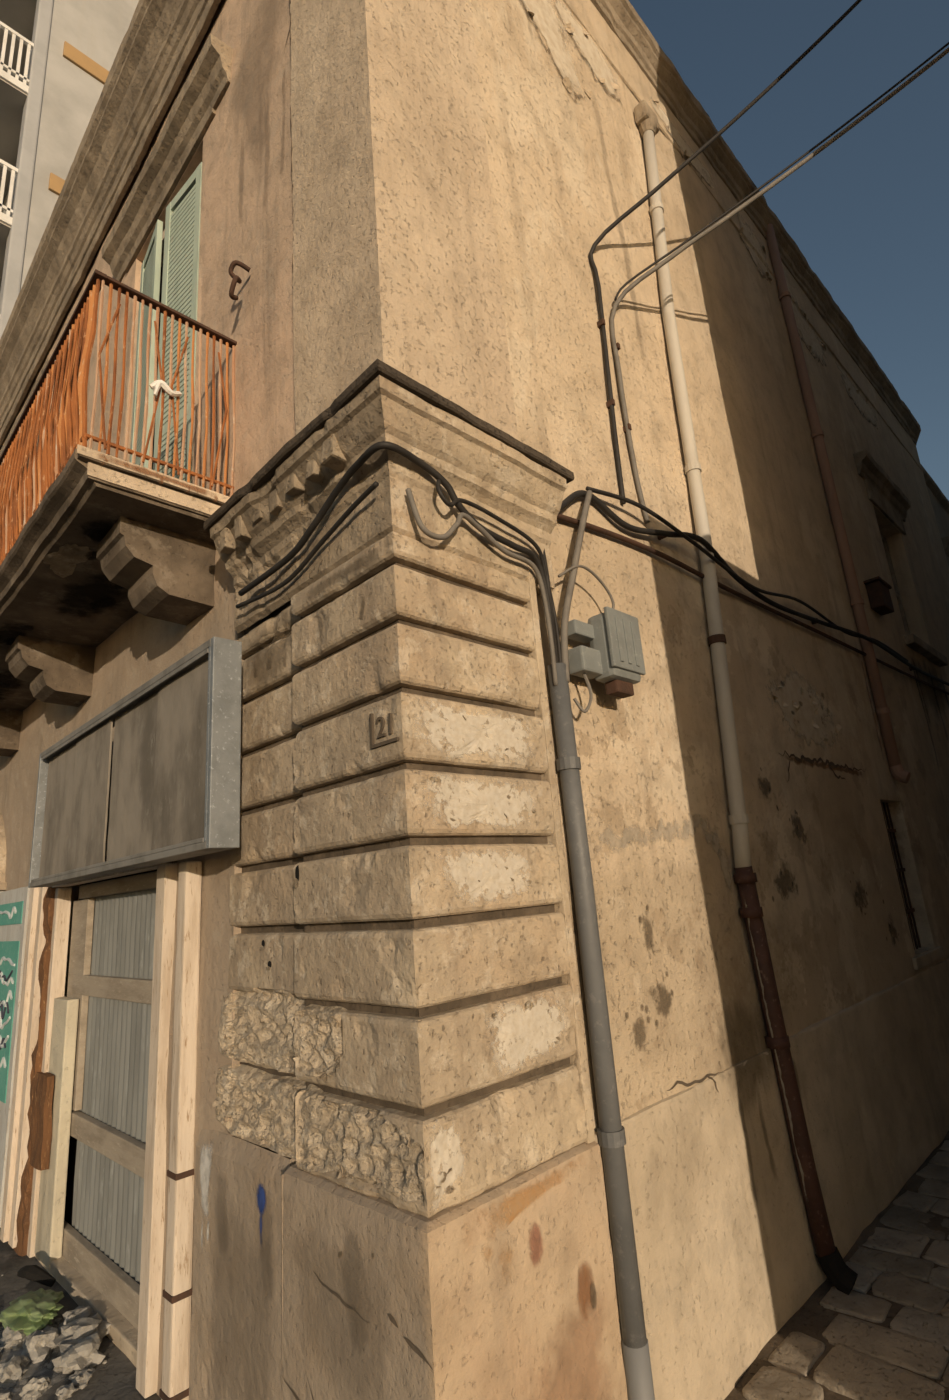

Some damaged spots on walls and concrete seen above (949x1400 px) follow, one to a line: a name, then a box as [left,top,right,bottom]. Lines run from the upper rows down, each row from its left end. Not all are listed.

leakage [84,518,134,560]
leakage [58,575,126,617]
crack [779,751,866,781]
leakage [639,905,652,947]
leakage [626,972,673,1049]
spalling [212,989,464,1206]
crack [667,1072,723,1092]
rust [530,1226,542,1262]
crack [313,1271,433,1370]
crack [282,1375,314,1400]